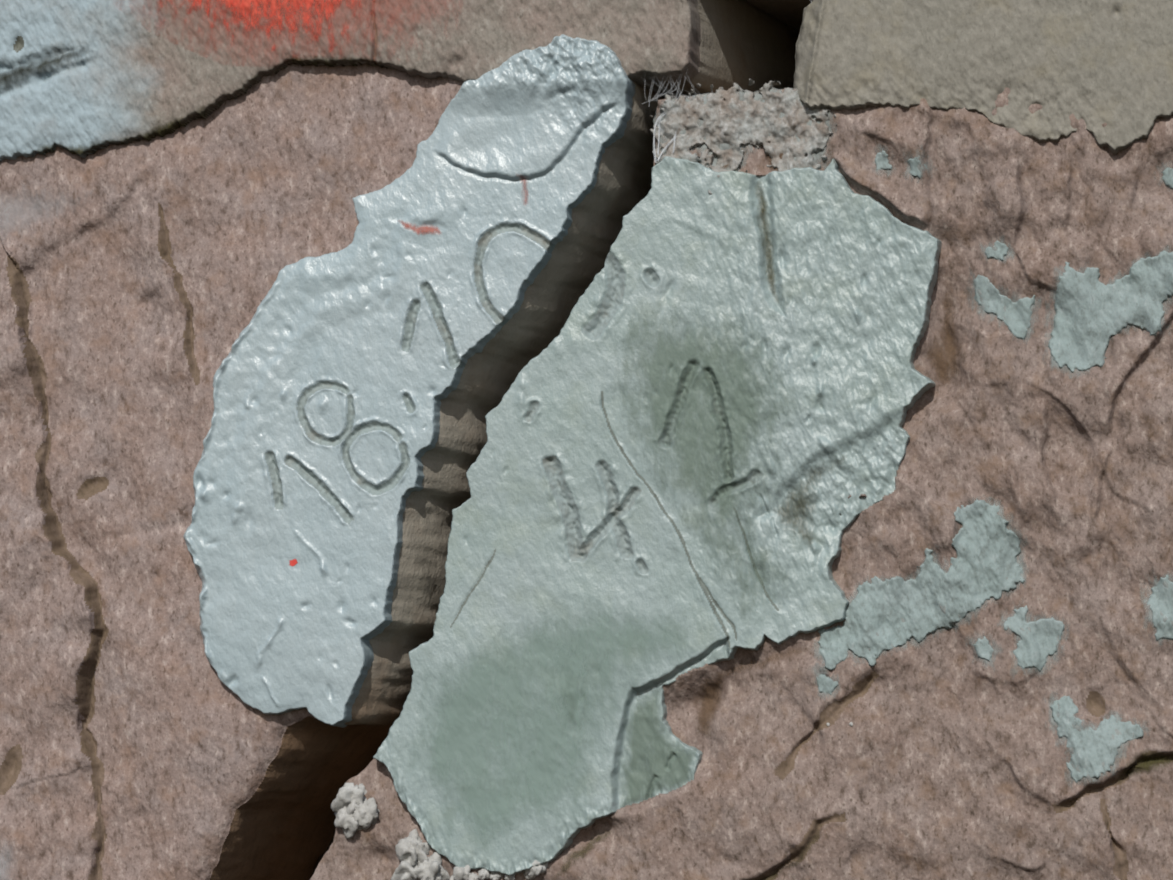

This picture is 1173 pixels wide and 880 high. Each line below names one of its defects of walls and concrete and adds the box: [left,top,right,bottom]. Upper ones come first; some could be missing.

crack [156,203,200,385]
spalling [913,255,979,401]
crack [6,255,109,880]
crack [210,82,663,880]
crack [601,391,737,649]
spalling [1086,691,1105,717]
crack [1052,751,1173,880]